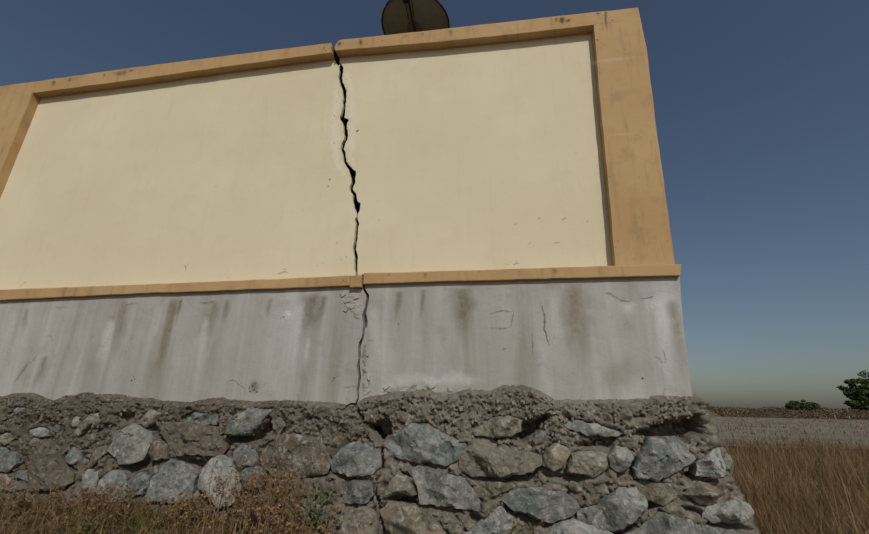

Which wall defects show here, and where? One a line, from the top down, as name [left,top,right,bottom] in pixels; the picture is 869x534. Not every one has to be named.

crack [333,47,369,328]
flaking render [340,292,362,320]
crack [374,425,387,439]